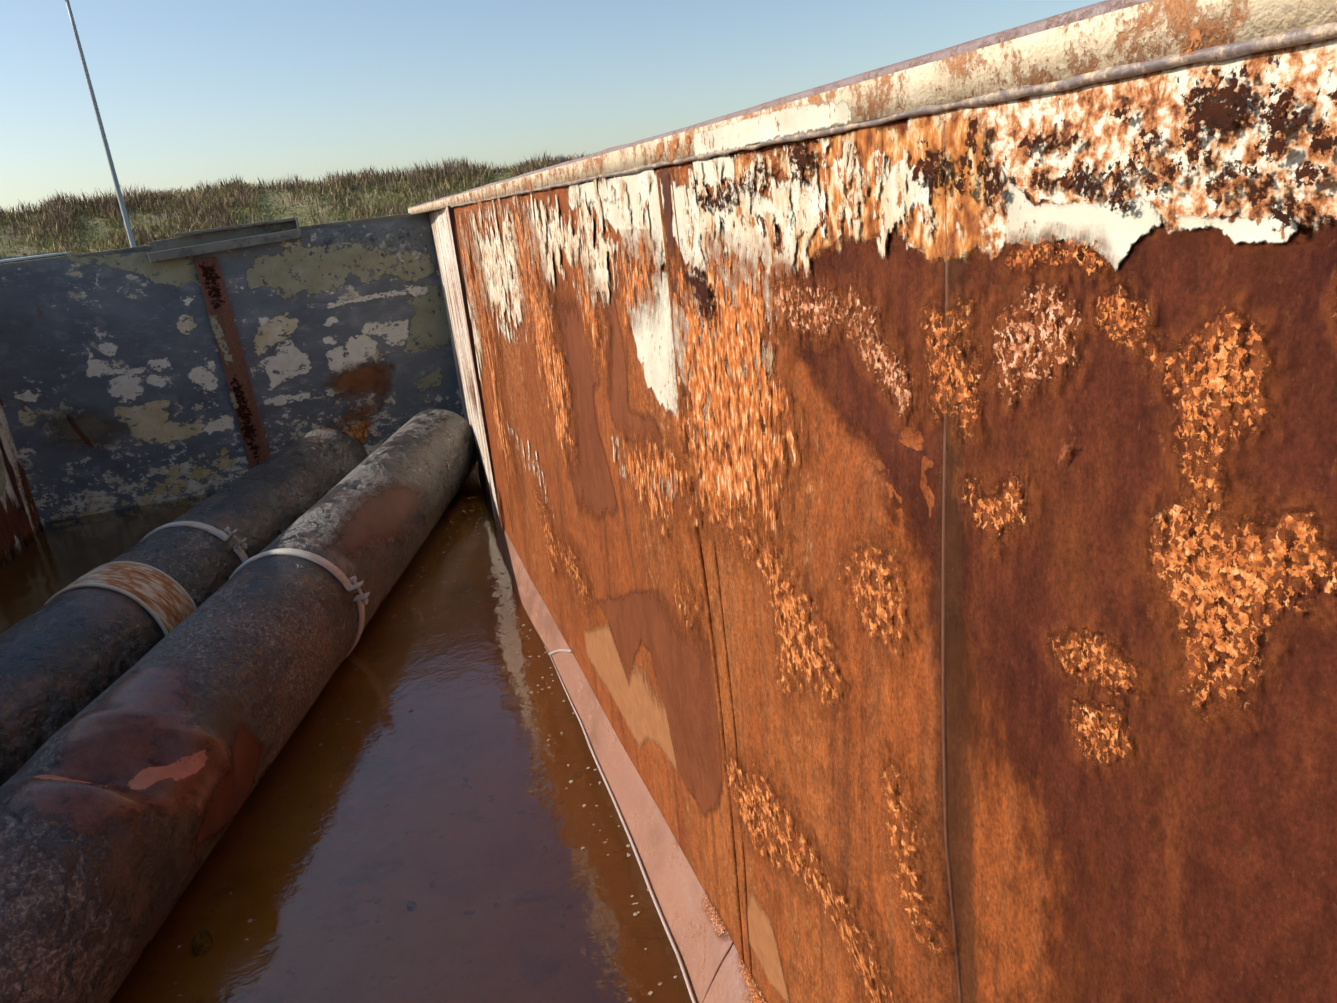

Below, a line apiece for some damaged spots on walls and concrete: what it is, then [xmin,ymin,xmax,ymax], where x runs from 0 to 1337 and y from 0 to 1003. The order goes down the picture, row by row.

peeling [1005,183,1297,270]
peeling [65,250,198,335]
peeling [245,228,450,392]
peeling [458,101,951,460]
peeling [13,388,42,426]
peeling [86,341,235,445]
peeling [270,393,396,445]
corrosion [326,361,392,445]
corrosion [455,168,589,610]
peeling [503,413,548,502]
corrosion [0,462,44,569]
corrosion [513,27,1337,1003]